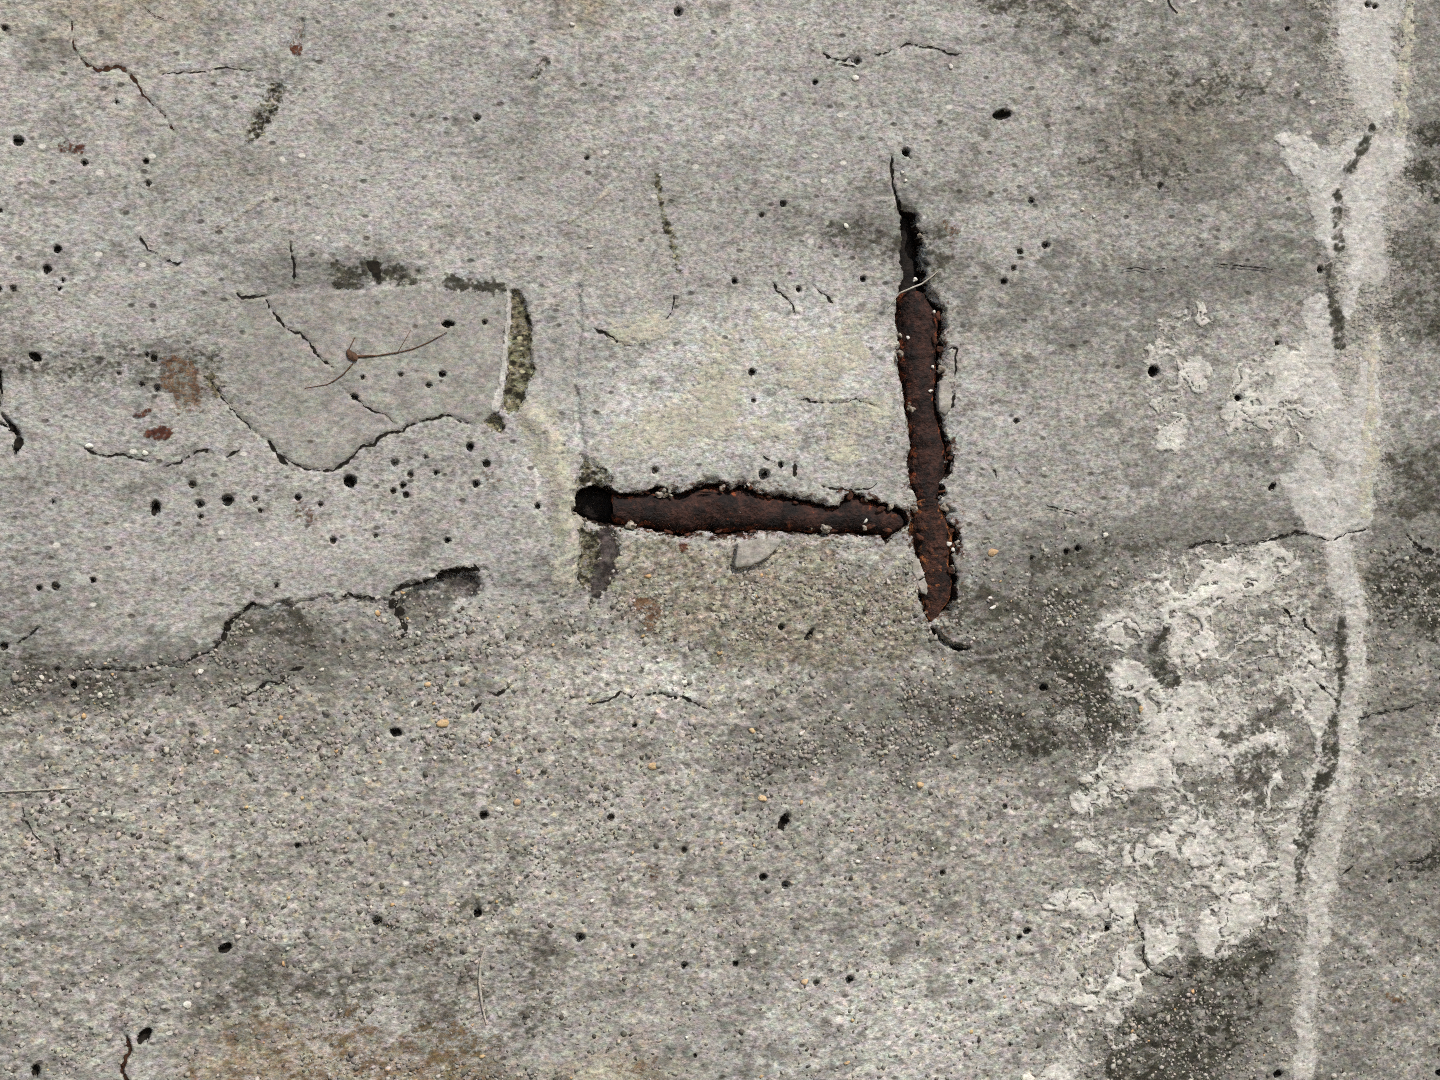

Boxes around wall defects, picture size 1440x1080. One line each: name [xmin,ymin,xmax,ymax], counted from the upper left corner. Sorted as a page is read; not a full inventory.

crack [140,236,182,265]
crack [85,244,469,472]
rust [605,526,788,552]
rust [619,480,813,502]
rust [816,470,914,551]
rust [946,503,964,557]
leakage [902,0,1440,1080]
crack [341,564,480,640]
rust [632,597,661,631]